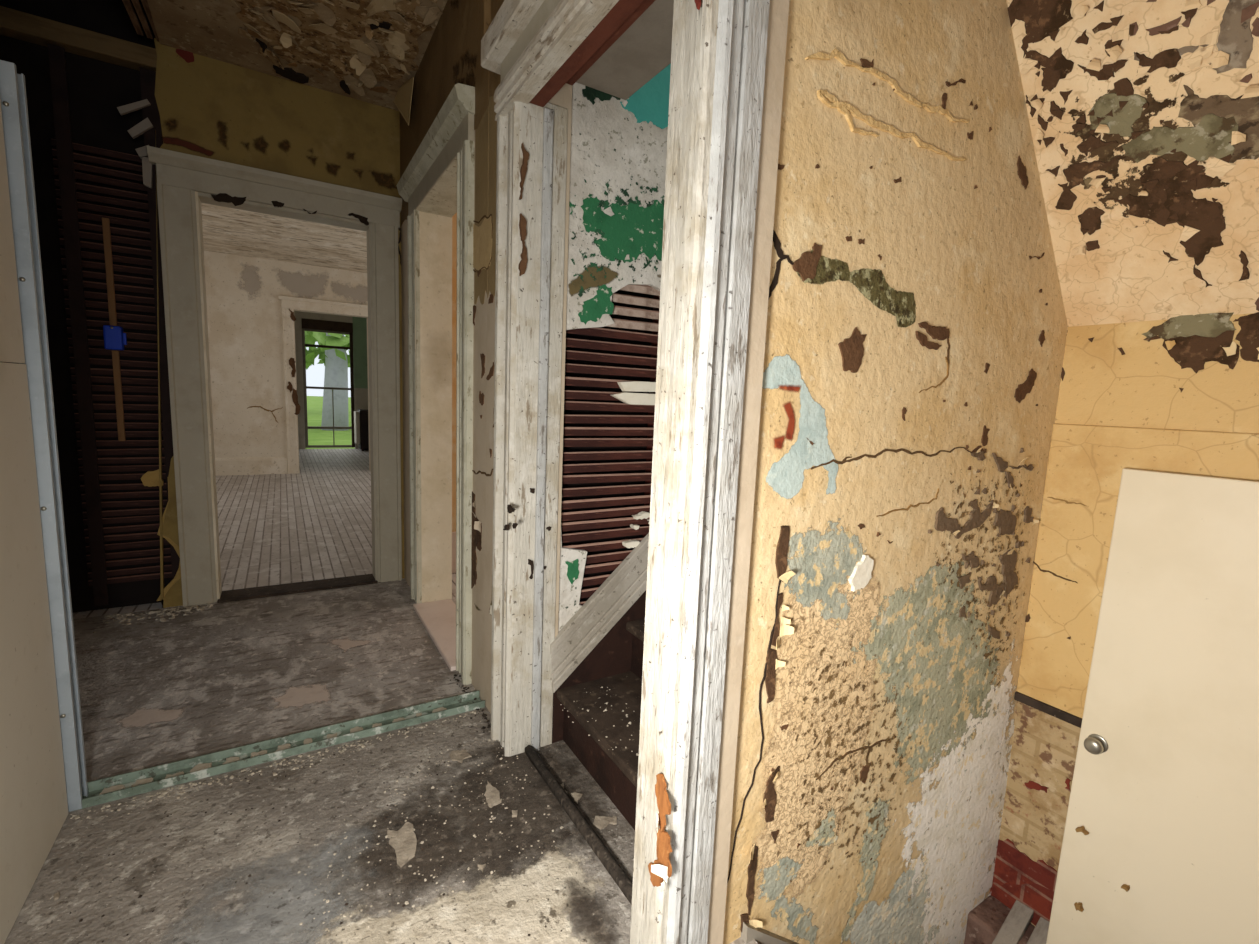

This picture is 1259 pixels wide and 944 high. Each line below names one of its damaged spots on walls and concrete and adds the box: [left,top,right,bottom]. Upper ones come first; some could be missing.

peeling [231,0,443,96]
peeling [1007,0,1259,287]
peeling [546,175,664,605]
peeling [1014,369,1038,406]
peeling [1142,298,1259,373]
flaking render [471,491,482,589]
peeling [765,518,893,703]
peeling [851,425,1039,785]
crack [811,447,1086,691]
peeling [648,773,673,892]
flaking render [763,766,780,843]
peeling [740,839,824,944]